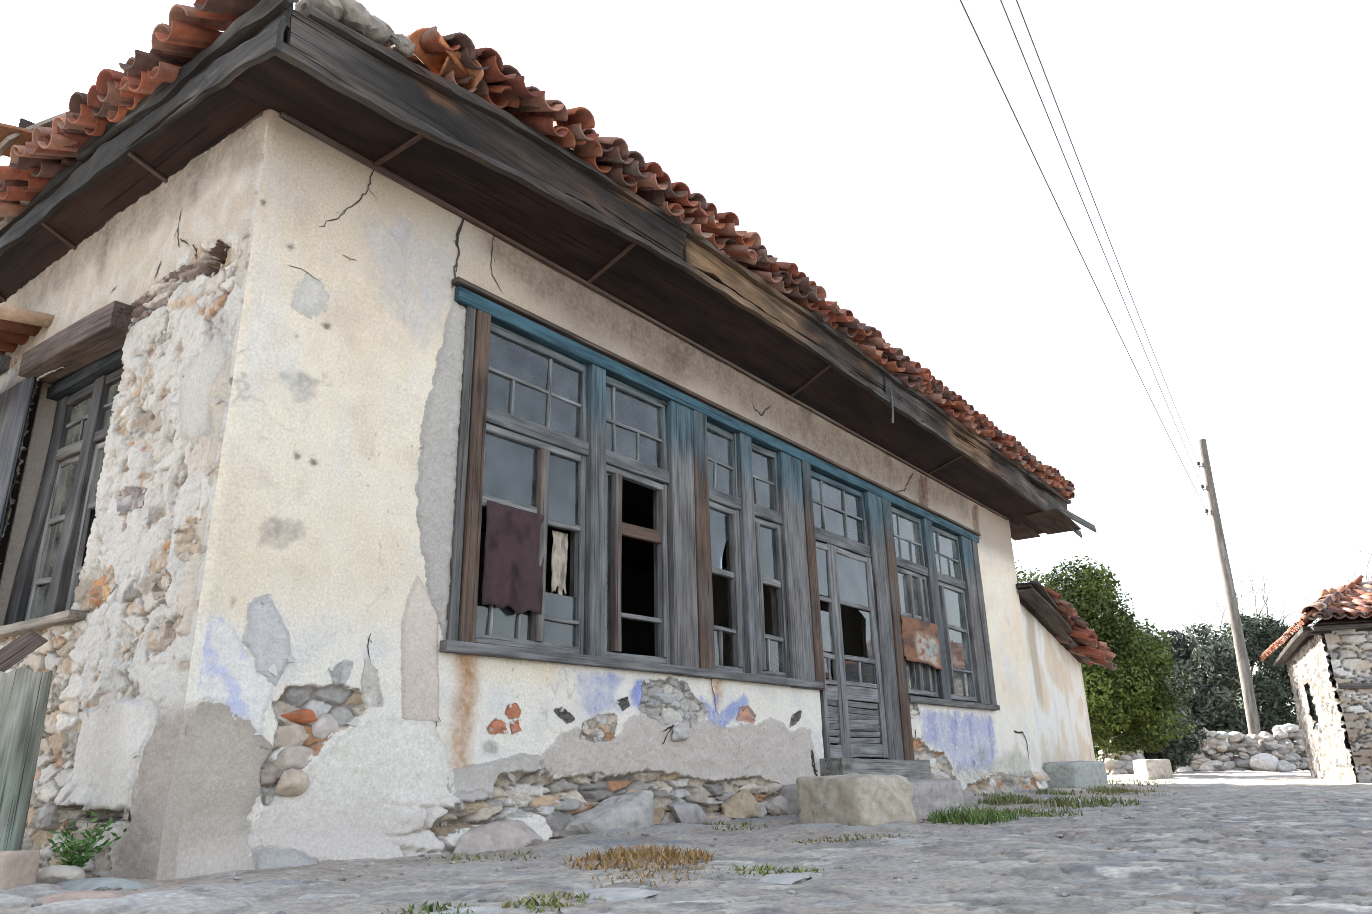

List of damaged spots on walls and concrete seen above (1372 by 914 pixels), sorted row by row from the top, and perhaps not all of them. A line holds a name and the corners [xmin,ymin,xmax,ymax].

crack [318,170,377,227]
crack [154,208,197,278]
spalling [128,218,251,329]
spalling [113,485,147,515]
spalling [87,565,118,609]
spalling [150,317,383,805]
spalling [487,703,522,735]
spalling [555,676,709,742]
spalling [736,705,756,724]
spalling [790,711,802,728]
peeling [54,697,157,825]